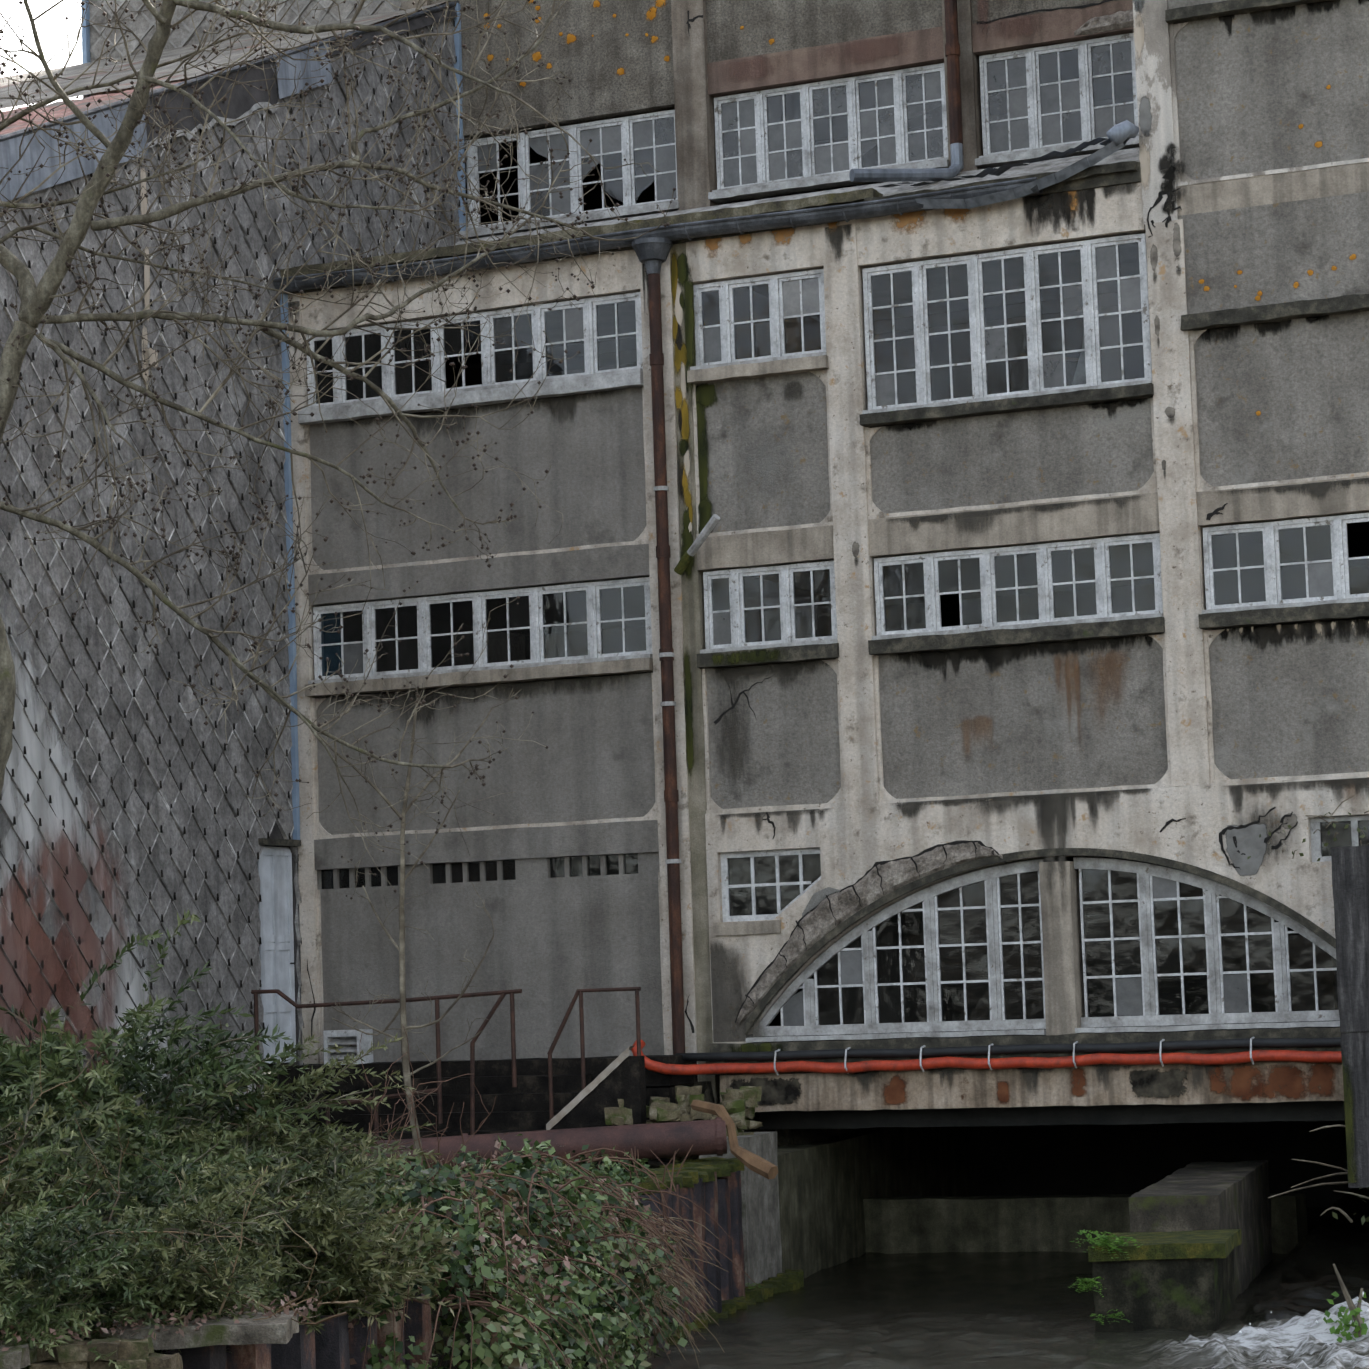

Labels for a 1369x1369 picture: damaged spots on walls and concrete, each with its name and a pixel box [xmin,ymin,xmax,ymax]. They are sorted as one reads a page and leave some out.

damp [893,210,926,231]
damp [944,208,970,222]
damp [1022,182,1137,229]
damp [705,233,752,255]
damp [772,228,795,244]
damp [670,251,717,578]
crack [714,677,771,725]
spalling [1219,807,1298,876]
spalling [730,1077,802,1105]
spalling [1129,1069,1187,1098]